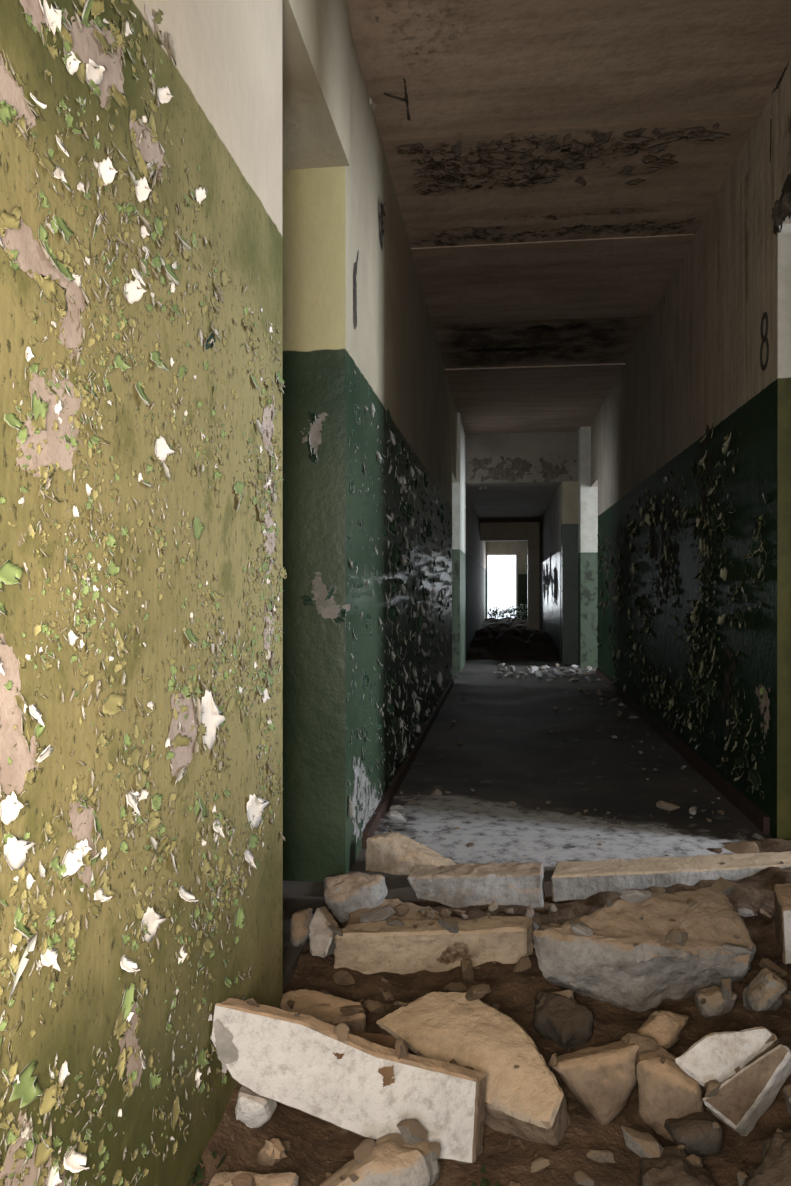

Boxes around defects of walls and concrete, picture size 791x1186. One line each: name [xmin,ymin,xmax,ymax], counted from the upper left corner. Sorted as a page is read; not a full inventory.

spalling [378,197,386,250]
spalling [771,173,791,236]
peeling [467,454,576,490]
peeling [301,368,453,843]
peeling [595,422,770,800]
peeling [378,1066,395,1087]